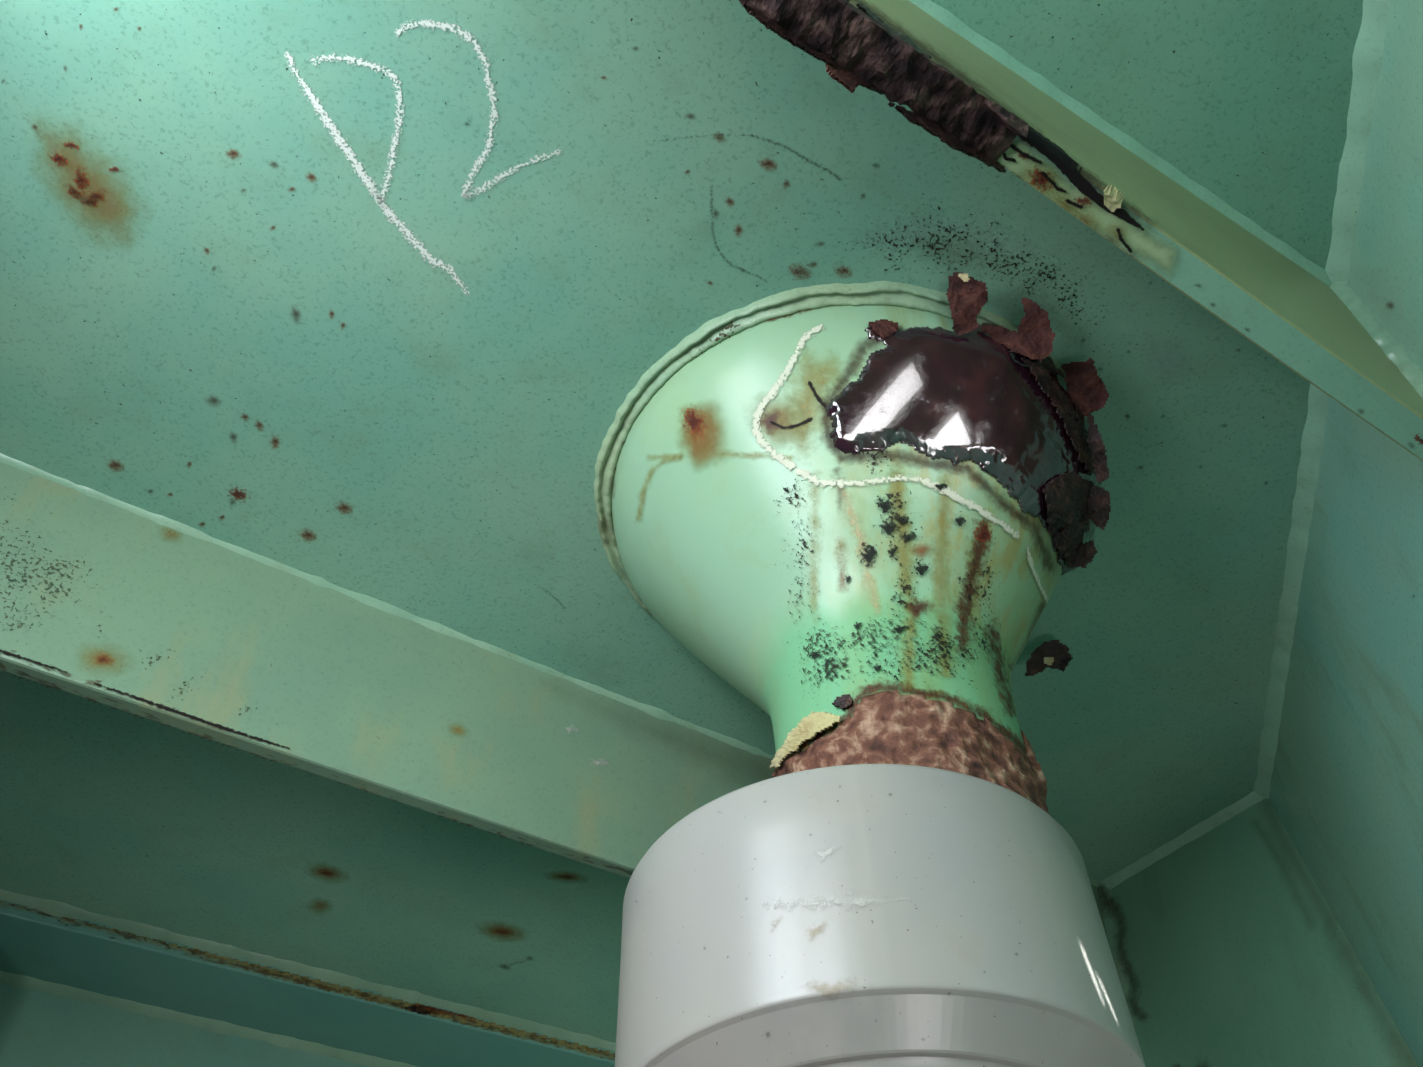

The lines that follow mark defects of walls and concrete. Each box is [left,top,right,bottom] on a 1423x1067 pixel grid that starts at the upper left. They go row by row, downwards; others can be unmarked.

rust [730,0,1028,173]
rust [48,142,127,223]
peeling [997,125,1175,271]
rust [663,408,724,463]
rust [760,193,1111,815]
rust [91,652,114,665]
rust [405,1003,476,1020]